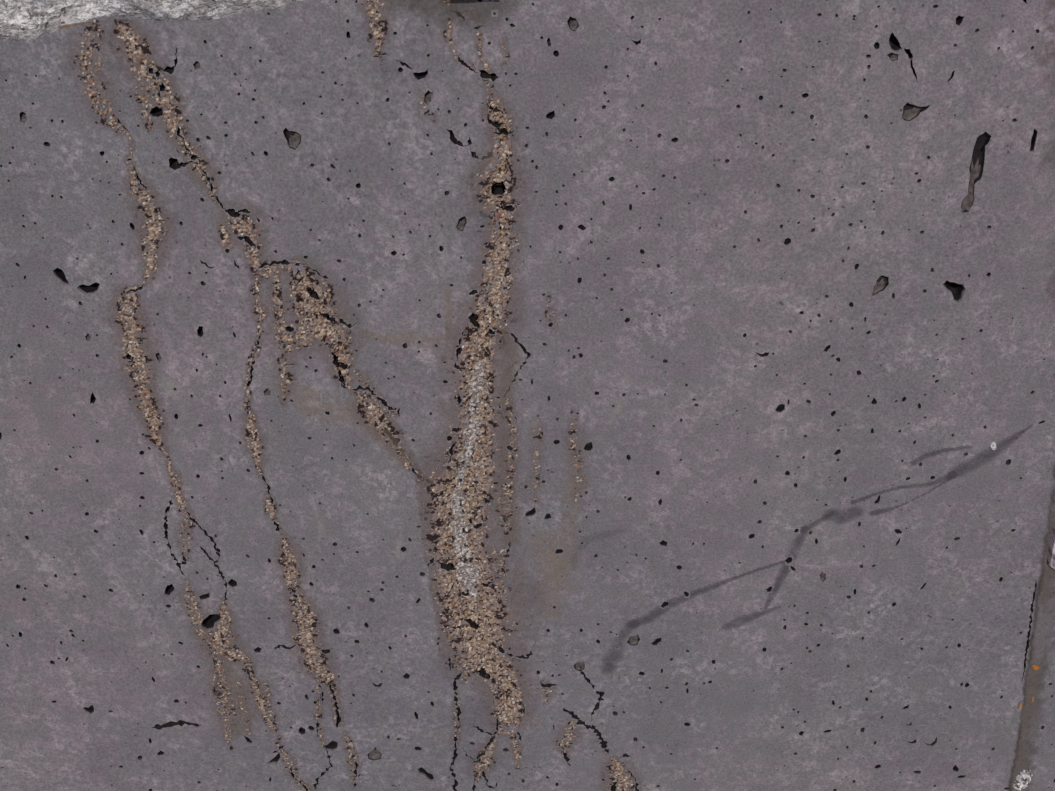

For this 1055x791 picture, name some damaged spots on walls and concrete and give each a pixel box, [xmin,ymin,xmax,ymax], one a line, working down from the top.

crack [1022,582,1037,680]
crack [151,720,201,730]